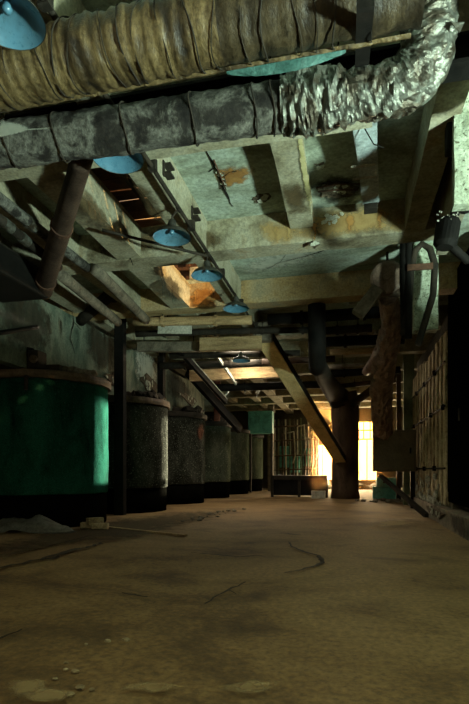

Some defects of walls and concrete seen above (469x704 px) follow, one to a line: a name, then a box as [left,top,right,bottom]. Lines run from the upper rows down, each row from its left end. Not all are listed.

corrosion [220,167,251,187]
damp [298,138,361,205]
crack [284,542,325,573]